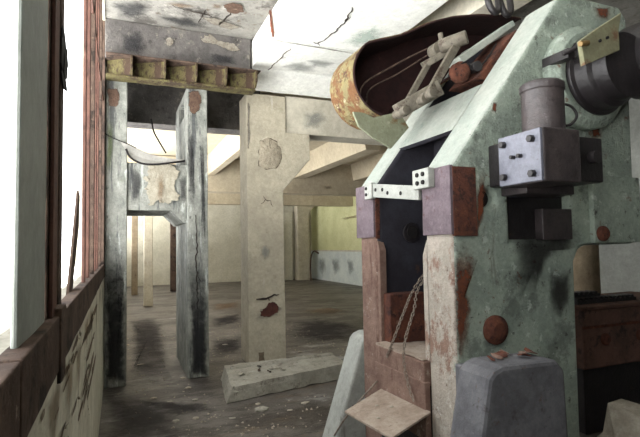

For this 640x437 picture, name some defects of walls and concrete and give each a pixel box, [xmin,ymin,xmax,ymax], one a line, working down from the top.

crack [172,5,232,25]
spalling [201,34,240,51]
crack [268,7,353,70]
peeling [143,164,180,206]
crack [194,215,202,306]
damp [103,278,122,378]
damp [192,293,206,373]
spalling [257,302,282,318]